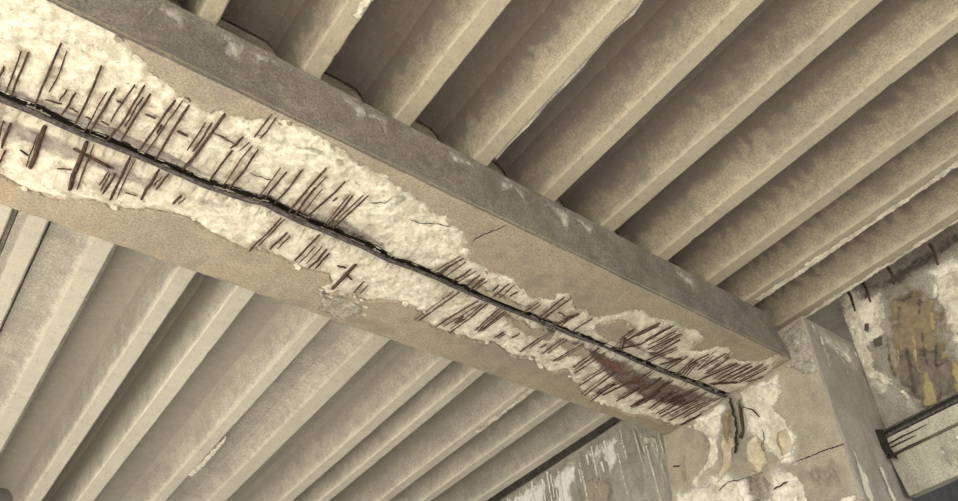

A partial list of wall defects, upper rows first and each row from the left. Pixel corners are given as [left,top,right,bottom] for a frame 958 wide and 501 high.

rust [0,120,155,188]
rust [0,86,202,173]
rust [302,212,382,246]
spalling [0,0,796,460]
crack [0,91,788,491]
rust [588,348,713,405]
spalling [783,219,958,374]
peeling [845,302,910,400]
water stain [812,234,958,406]
peeling [687,415,744,501]
rust [721,411,730,441]
peeling [749,471,807,501]